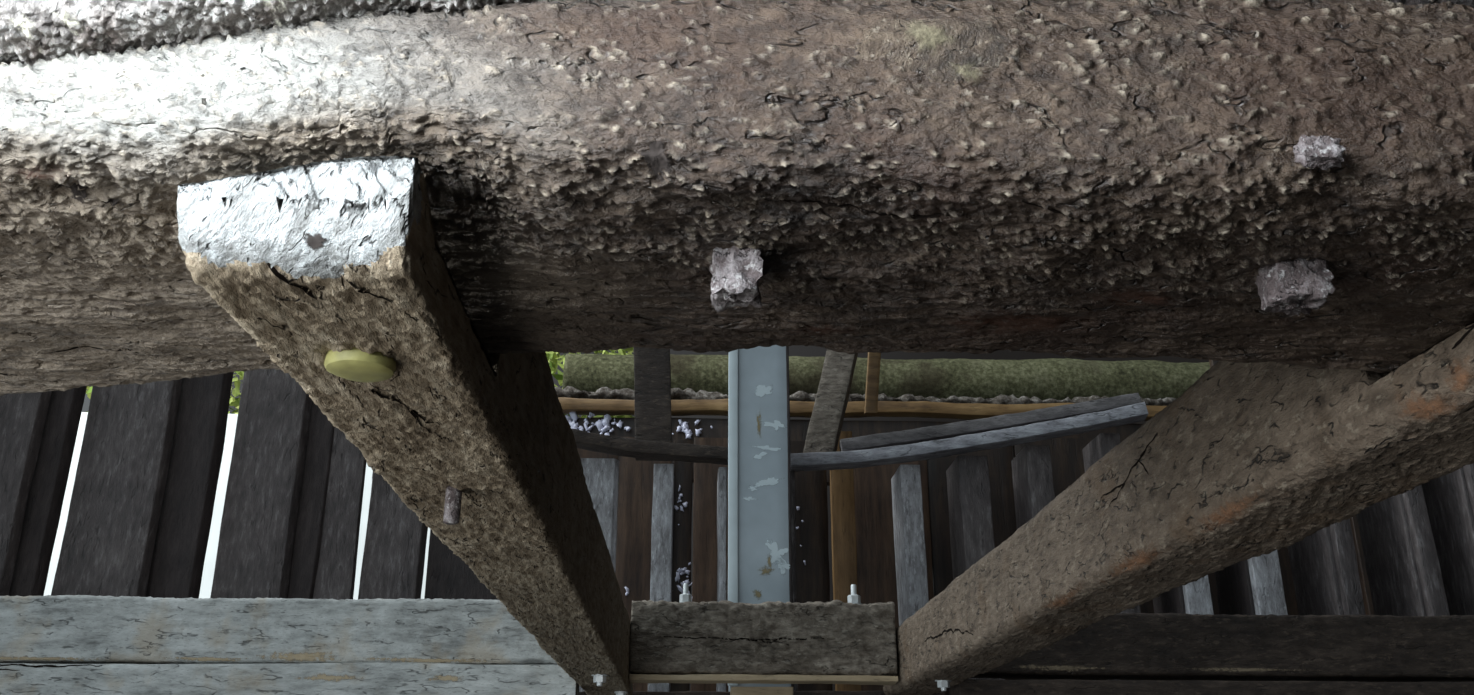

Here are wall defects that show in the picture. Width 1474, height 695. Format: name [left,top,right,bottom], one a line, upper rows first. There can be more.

crack [1452,324,1474,349]
crack [1101,433,1157,506]
crack [925,628,973,642]